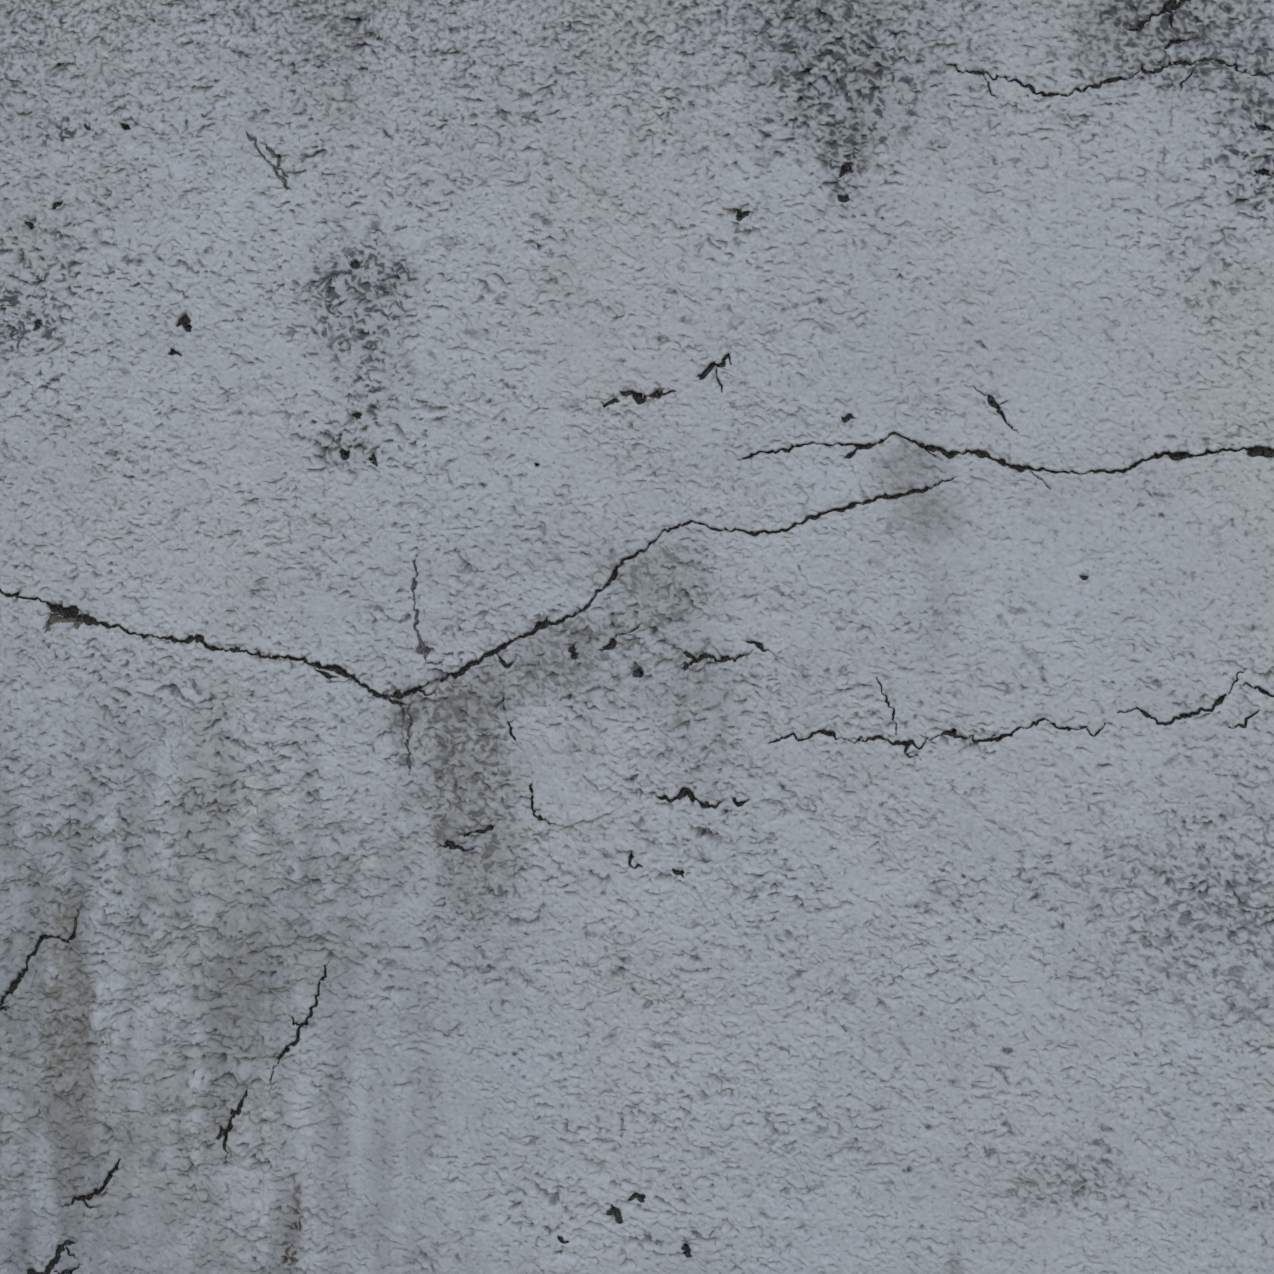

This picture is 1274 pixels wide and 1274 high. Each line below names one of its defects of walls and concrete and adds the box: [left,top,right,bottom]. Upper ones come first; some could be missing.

crack [950,0,1274,99]
crack [975,389,1019,433]
crack [0,432,1274,770]
crack [529,784,555,824]
crack [0,910,79,1027]
crack [215,961,329,1163]